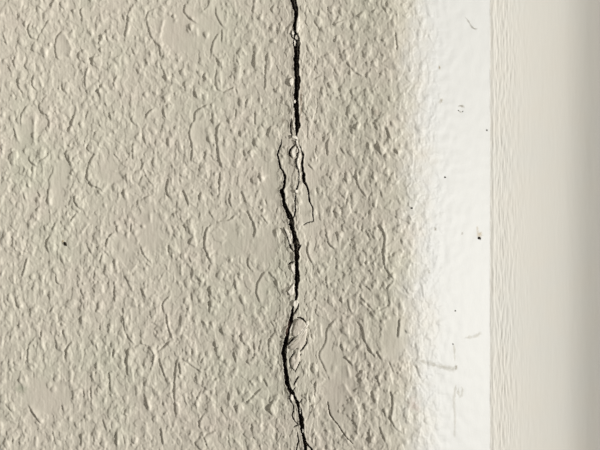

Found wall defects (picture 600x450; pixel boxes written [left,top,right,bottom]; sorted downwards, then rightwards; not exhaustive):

crack [277,0,314,450]